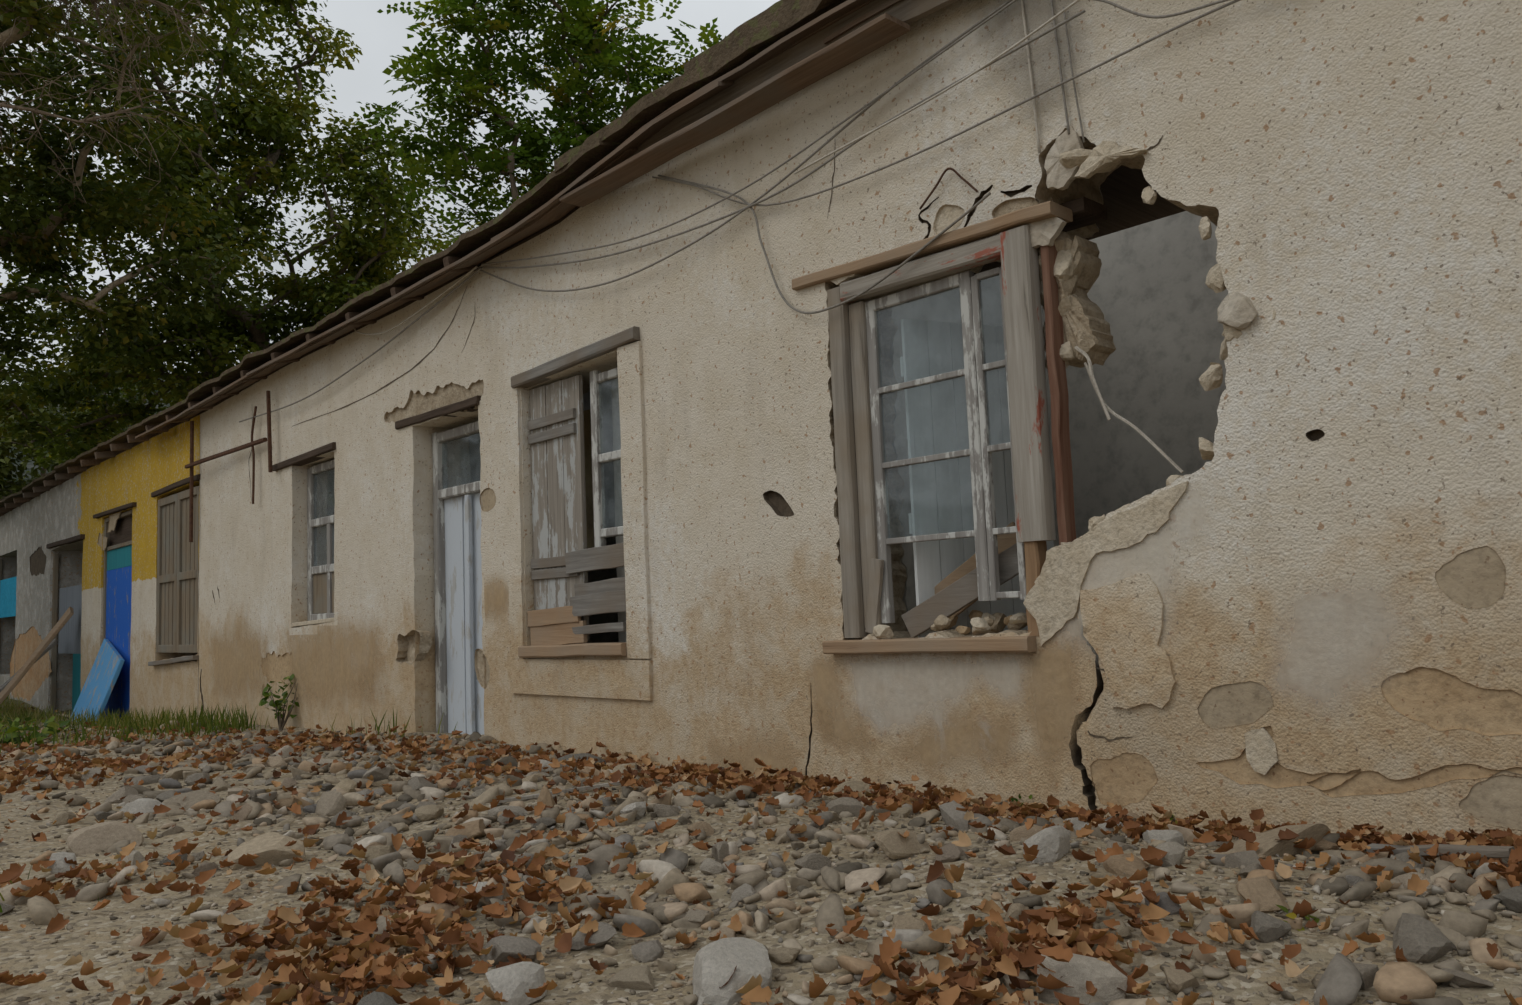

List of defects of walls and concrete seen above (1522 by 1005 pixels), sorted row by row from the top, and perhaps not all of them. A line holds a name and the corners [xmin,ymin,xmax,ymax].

spalling [1435,546,1506,609]
spalling [1381,667,1522,736]
spalling [1196,681,1522,830]